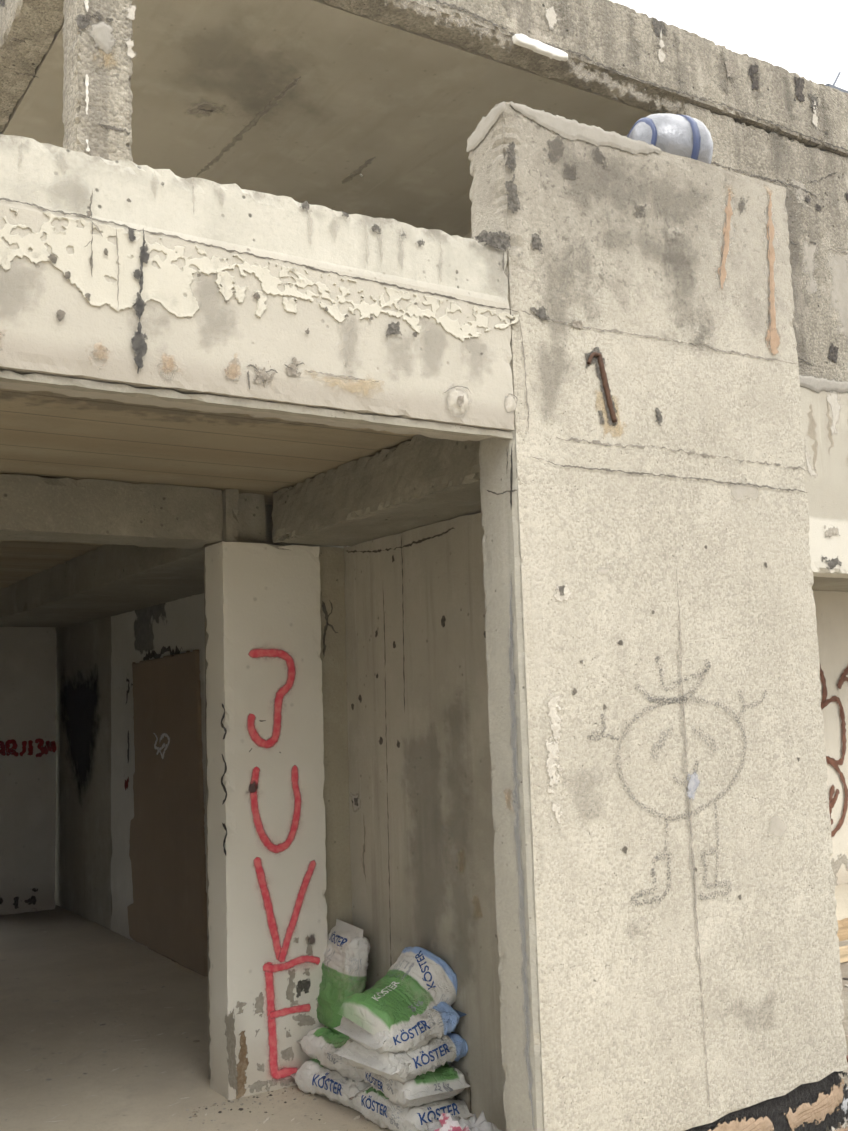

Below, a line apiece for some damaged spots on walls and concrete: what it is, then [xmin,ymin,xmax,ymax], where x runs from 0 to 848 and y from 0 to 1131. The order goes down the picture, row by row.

leakage [128,227,150,373]
peeling [0,208,520,342]
crack [0,193,813,493]
corrosion [716,192,733,289]
corrosion [765,192,780,355]
leakage [827,391,841,434]
spalling [821,557,842,569]
peeling [225,992,295,1099]
peeling [281,935,319,1061]